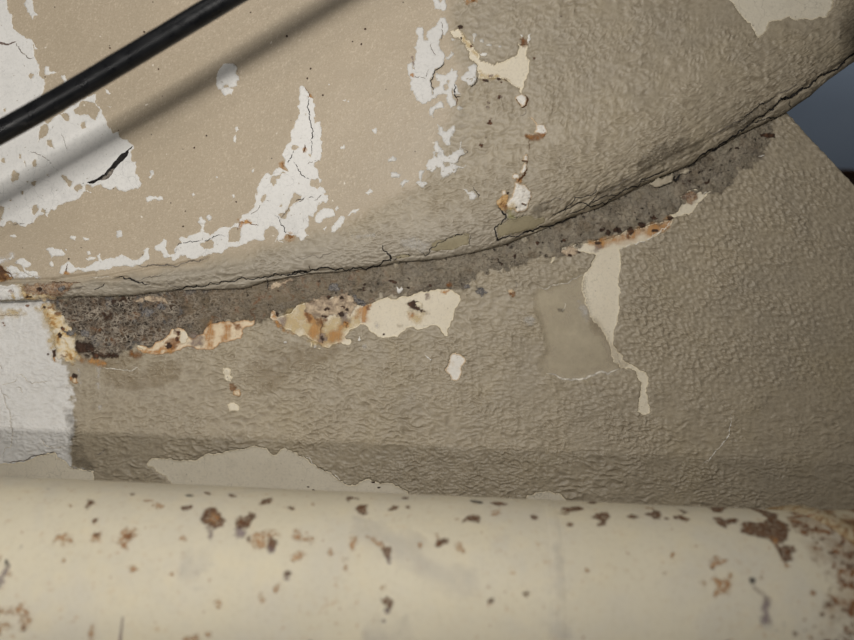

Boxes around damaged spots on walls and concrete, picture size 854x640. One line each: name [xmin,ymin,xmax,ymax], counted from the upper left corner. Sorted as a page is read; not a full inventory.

crack [0,41,32,59]
peeling [0,0,67,118]
peeling [0,88,154,238]
peeling [46,68,359,274]
crack [52,88,471,291]
peeling [270,289,461,350]
corrosion [0,121,775,384]
peeling [388,0,477,188]
crack [421,22,478,105]
peeling [550,189,710,415]
crack [494,53,854,241]
crack [0,366,104,474]